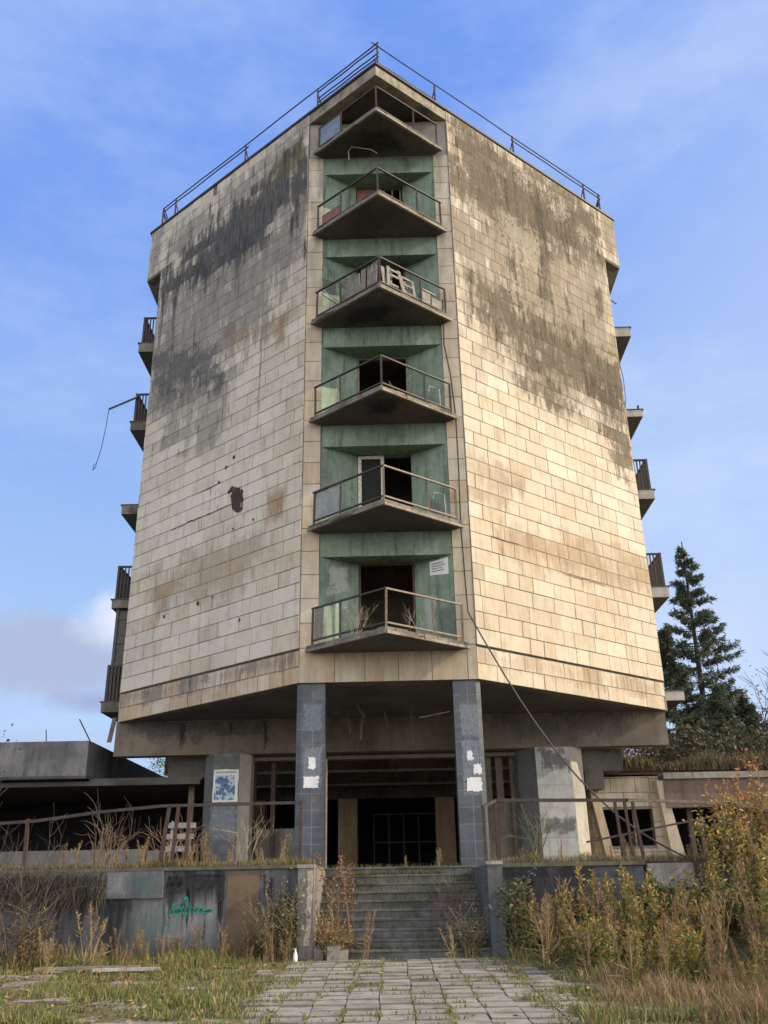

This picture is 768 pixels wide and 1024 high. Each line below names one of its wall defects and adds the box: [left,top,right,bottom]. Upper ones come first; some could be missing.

water stain [158,137,307,328]
water stain [448,117,634,483]
water stain [151,341,225,407]
crack [172,482,230,530]
hole [218,481,243,513]